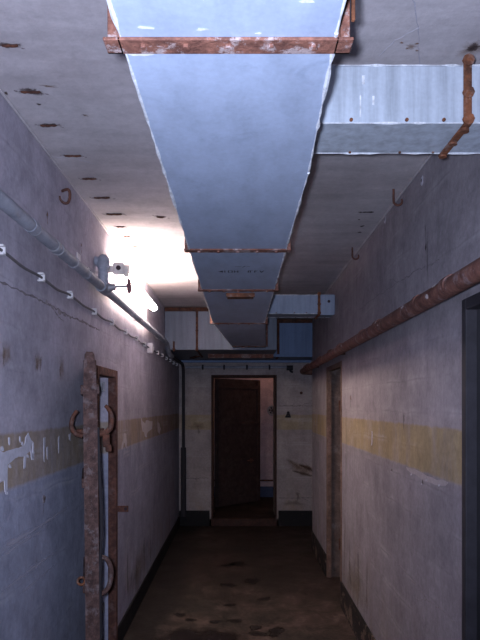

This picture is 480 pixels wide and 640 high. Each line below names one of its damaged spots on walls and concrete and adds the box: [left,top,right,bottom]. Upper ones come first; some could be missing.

crack [0,281,99,330]
peeling [0,433,34,495]